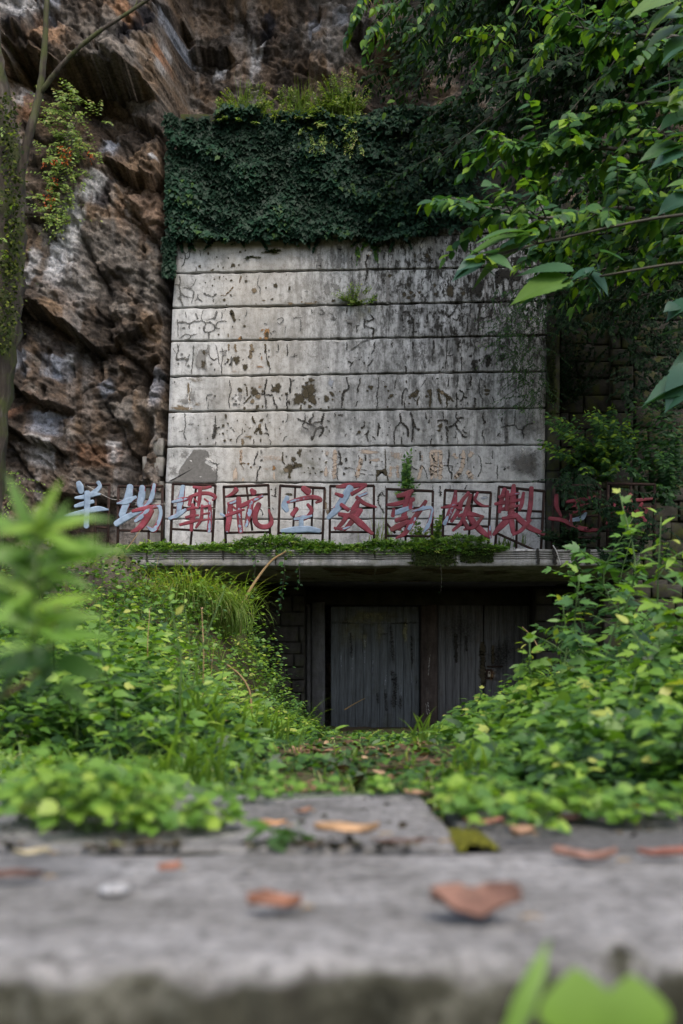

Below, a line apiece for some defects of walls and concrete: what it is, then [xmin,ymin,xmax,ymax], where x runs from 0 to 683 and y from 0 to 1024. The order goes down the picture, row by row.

crack [172,250,534,515]